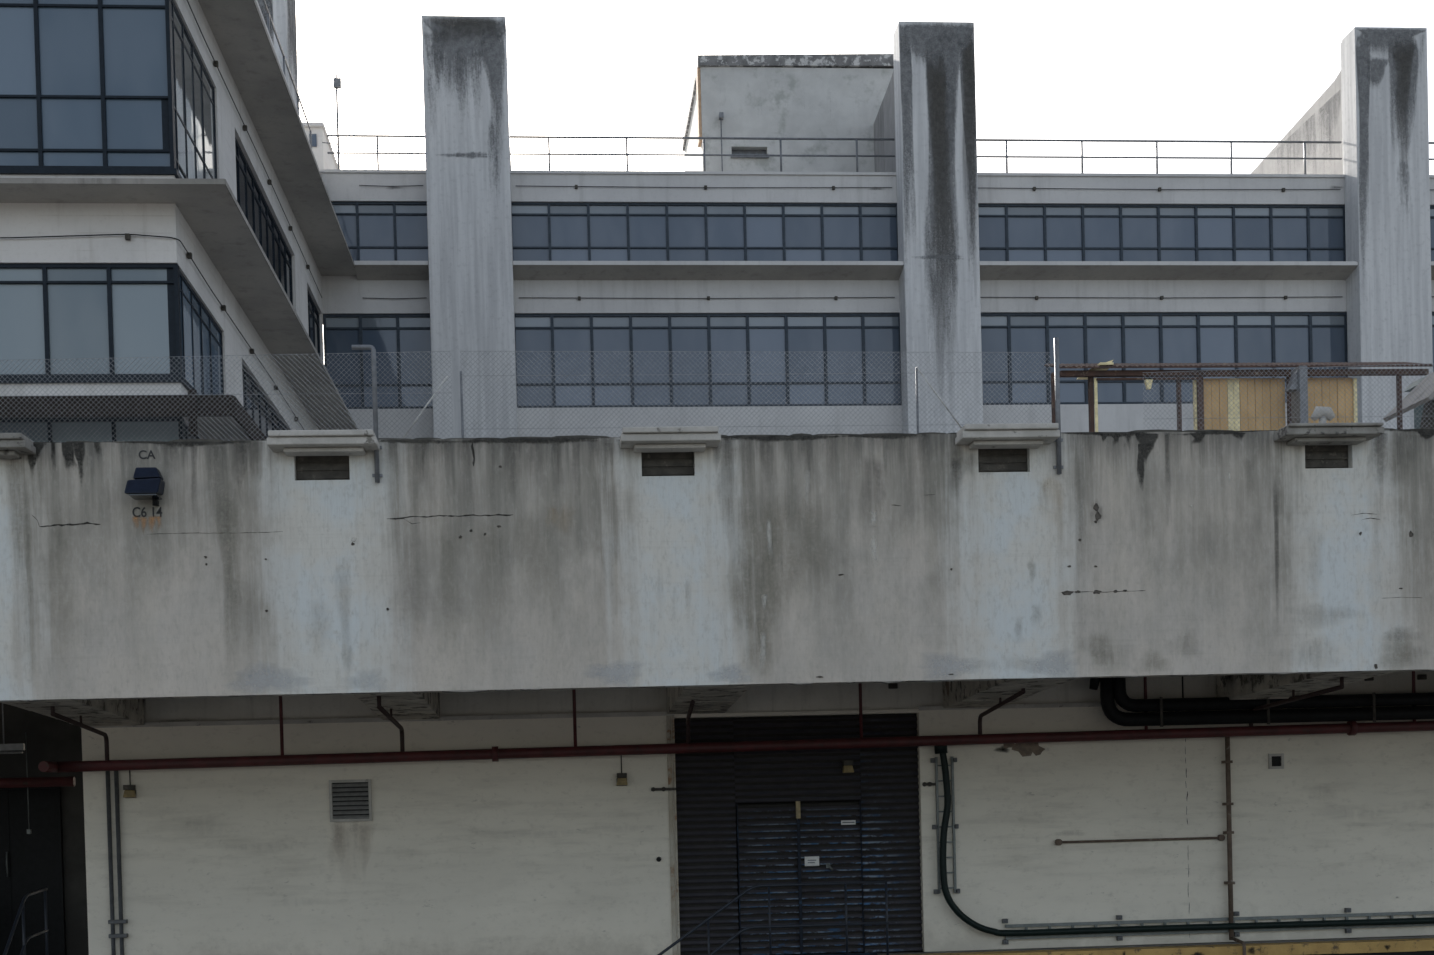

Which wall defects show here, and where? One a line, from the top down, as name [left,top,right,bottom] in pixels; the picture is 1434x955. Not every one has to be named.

water stain [425,18,506,161]
water stain [899,24,976,283]
water stain [1356,29,1424,245]
water stain [28,442,99,477]
water stain [1066,432,1158,483]
water stain [1184,431,1254,442]
water stain [1389,429,1434,438]